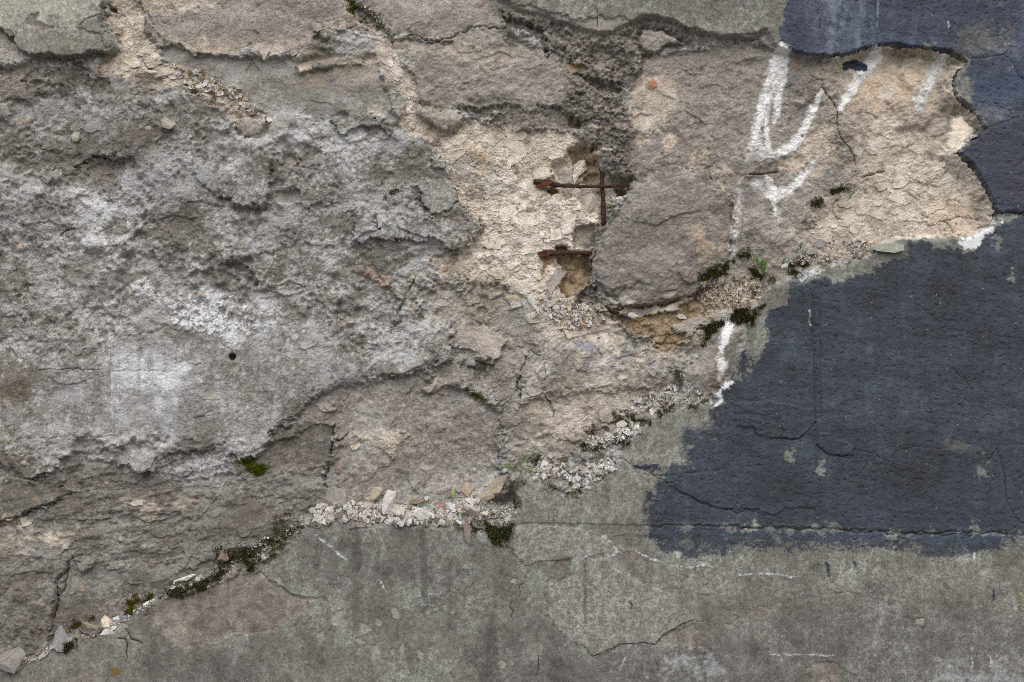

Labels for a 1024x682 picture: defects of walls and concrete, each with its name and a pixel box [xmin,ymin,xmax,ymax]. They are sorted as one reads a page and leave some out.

crack [812,76,881,178]
rust [533,168,630,226]
spalling [369,10,1000,353]
spalling [0,0,715,674]
crack [629,449,1023,537]